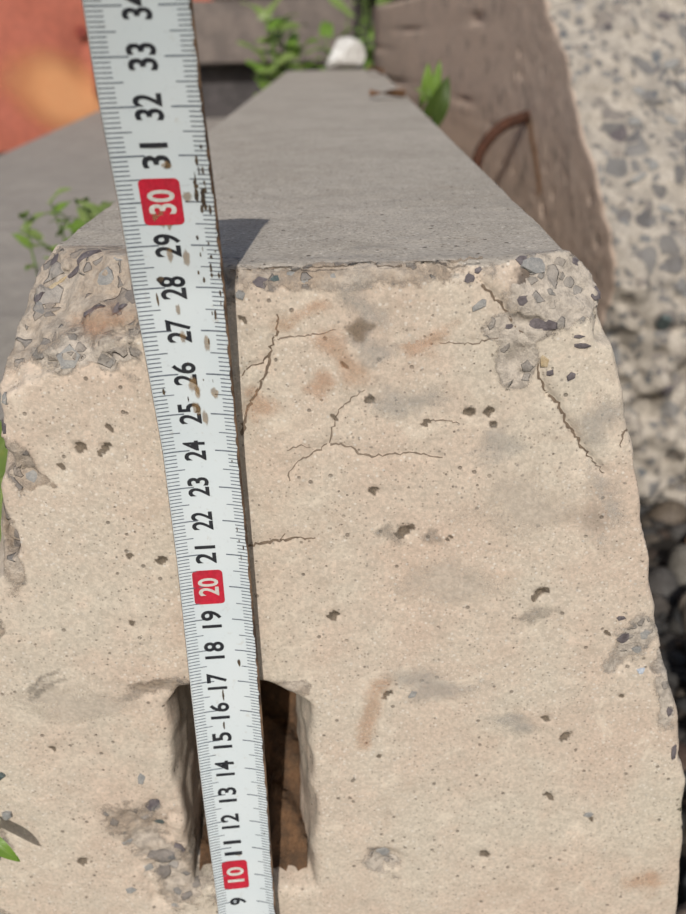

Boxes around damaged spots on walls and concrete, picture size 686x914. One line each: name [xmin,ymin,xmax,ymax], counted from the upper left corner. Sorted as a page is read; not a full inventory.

spalling [3,245,142,375]
spalling [472,299,486,312]
spalling [464,265,496,283]
crack [440,284,524,345]
spalling [481,249,601,389]
crack [240,314,335,435]
crack [287,390,442,481]
crack [537,363,604,473]
spalling [103,799,212,911]